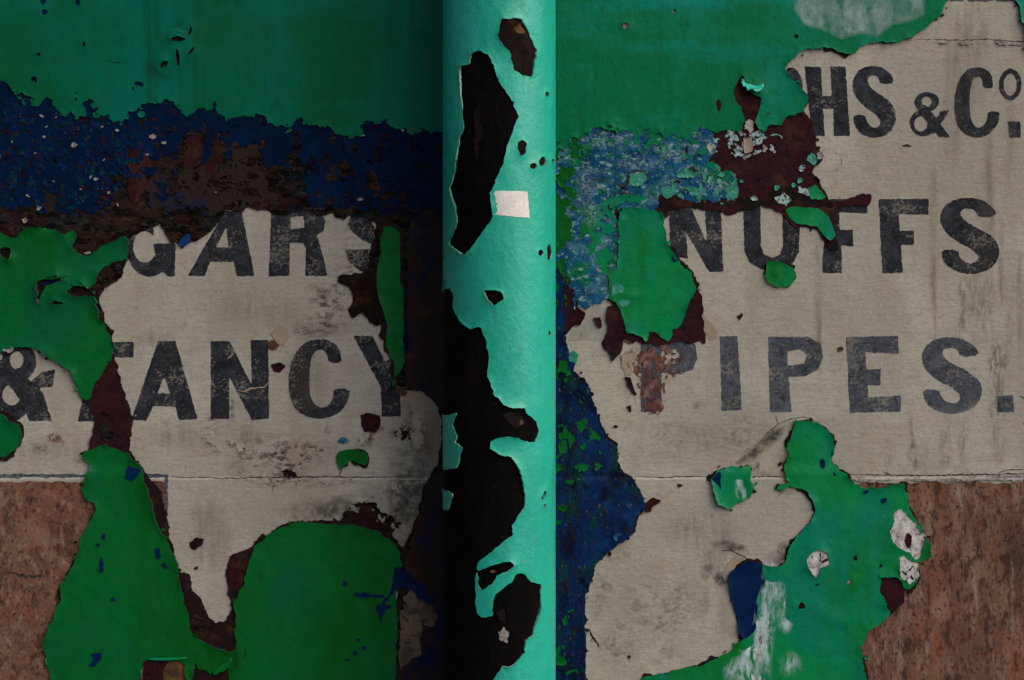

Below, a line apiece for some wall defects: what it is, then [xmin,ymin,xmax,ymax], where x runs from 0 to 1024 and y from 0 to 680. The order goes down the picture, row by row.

peeling [0,0,540,680]
peeling [530,0,948,680]
peeling [1014,0,1024,25]